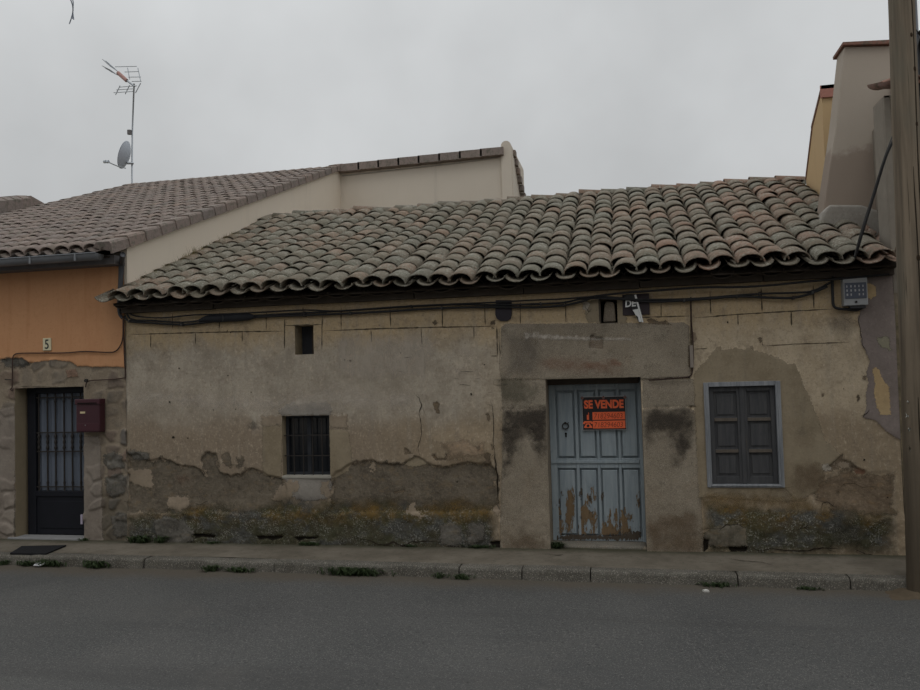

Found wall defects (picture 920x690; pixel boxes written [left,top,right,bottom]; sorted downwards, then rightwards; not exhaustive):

leakage [504,412,544,451]
flaking render [154,515,194,543]
peeling [557,486,641,541]